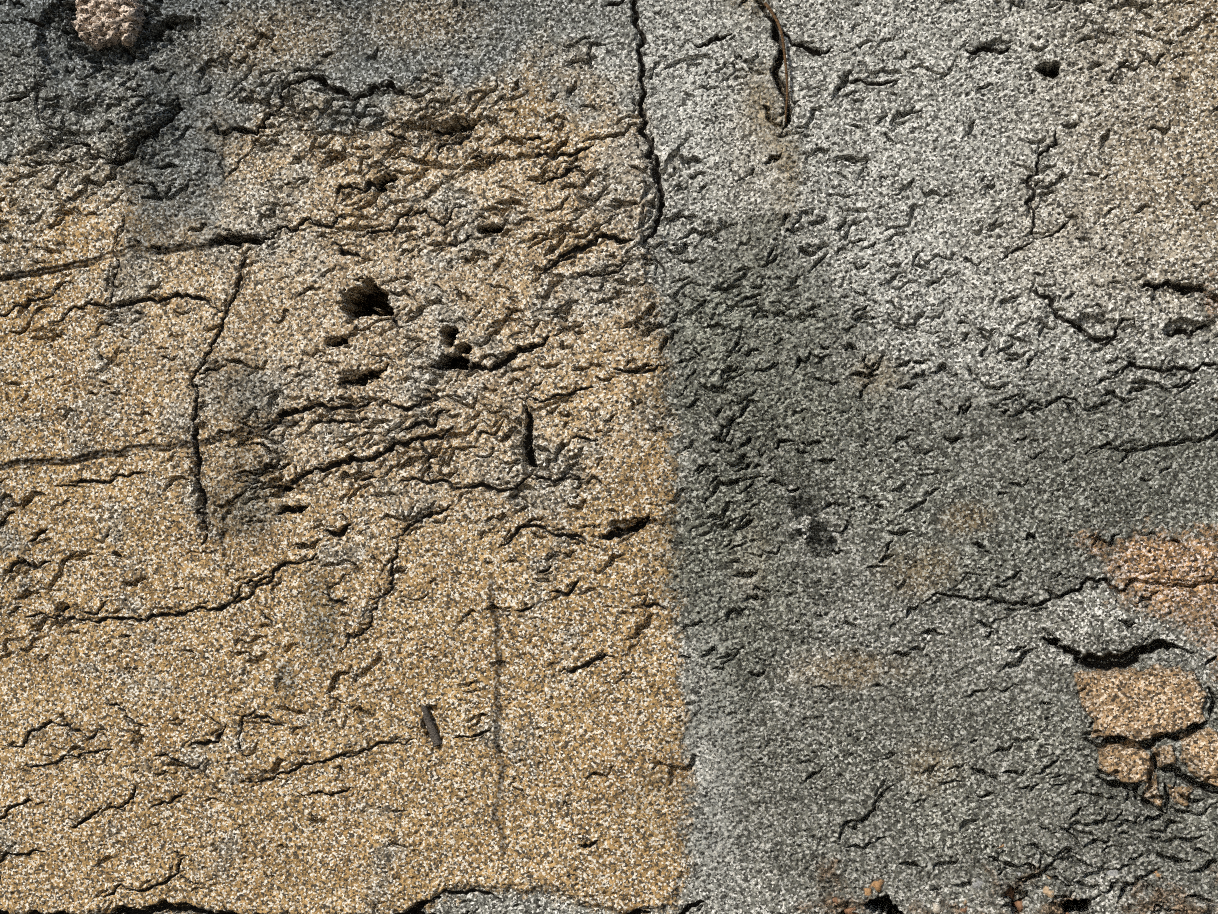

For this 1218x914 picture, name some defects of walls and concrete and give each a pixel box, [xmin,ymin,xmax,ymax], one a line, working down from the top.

crack [217,75,421,136]
crack [539,0,666,278]
crack [0,172,473,544]
crack [27,336,667,654]
crack [8,697,148,768]
crack [70,710,414,829]
peeling [1074,663,1218,815]
crack [104,855,260,914]
spalling [802,859,886,914]
spalling [898,870,989,914]
spalling [999,870,1073,914]
spalling [1125,871,1214,914]